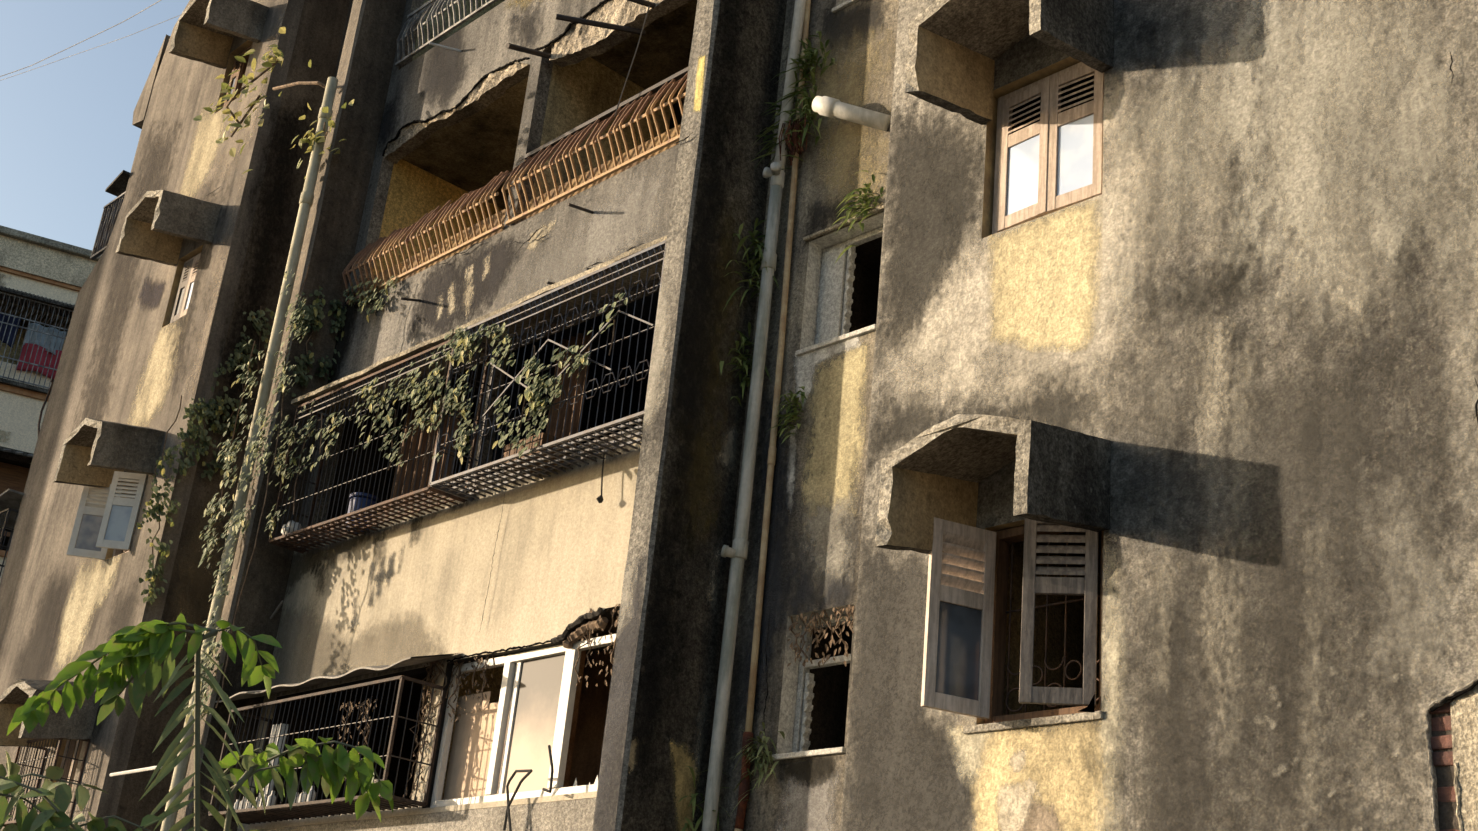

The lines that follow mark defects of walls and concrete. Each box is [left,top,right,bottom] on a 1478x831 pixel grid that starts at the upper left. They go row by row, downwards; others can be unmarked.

leakage [421,30,467,107]
leakage [510,11,539,47]
spalling [382,0,691,164]
leakage [409,163,664,337]
leakage [803,0,1478,472]
leakage [327,297,359,384]
leakage [594,0,744,831]
leakage [1198,325,1229,637]
crack [1470,377,1478,422]
leakage [263,433,629,698]
flaking render [1425,677,1478,831]